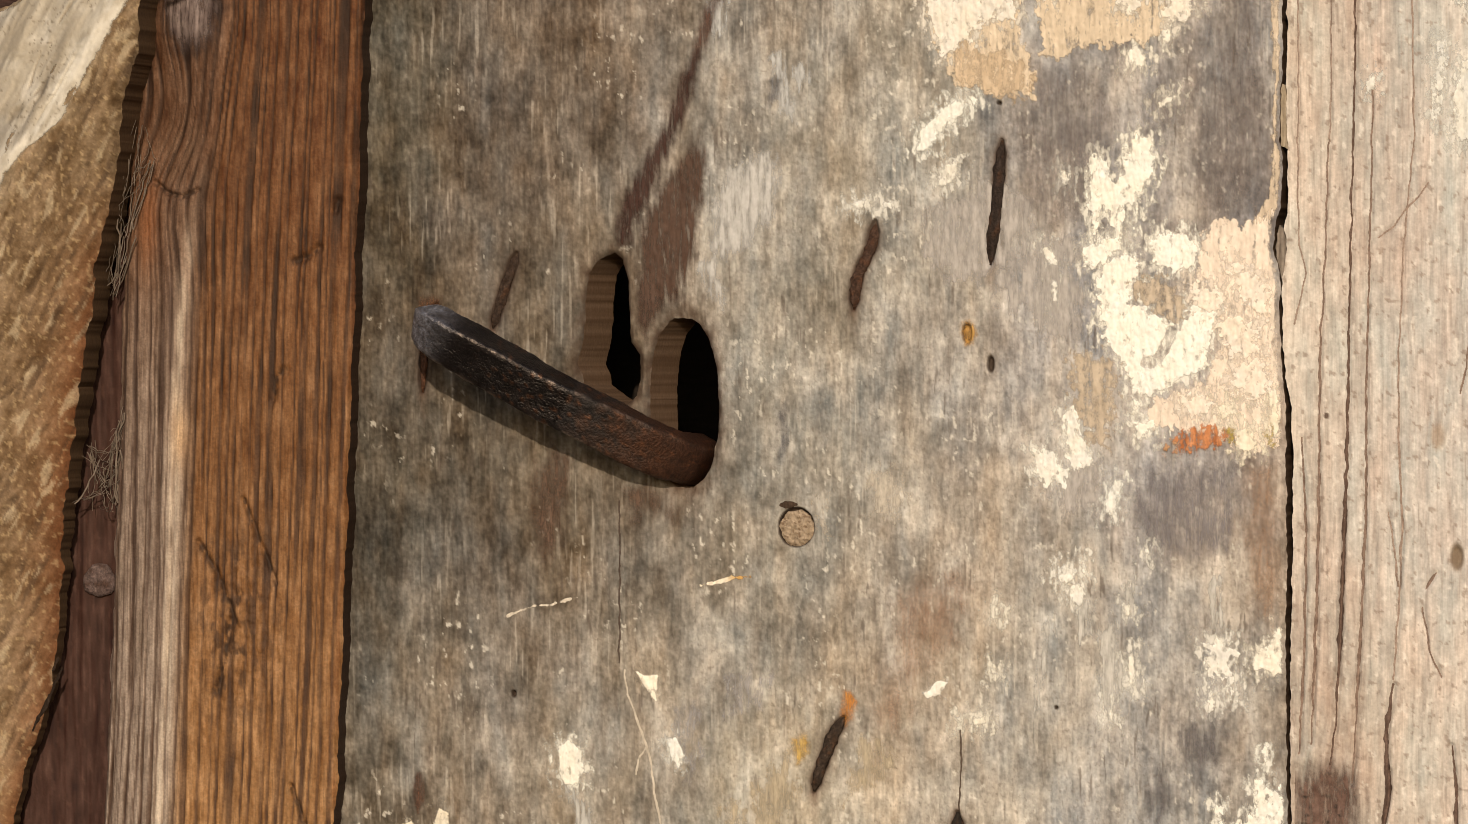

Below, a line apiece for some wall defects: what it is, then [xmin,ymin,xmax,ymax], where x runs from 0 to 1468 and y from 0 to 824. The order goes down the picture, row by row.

rust [617,0,720,332]
peeling [835,188,900,227]
peeling [903,0,1281,467]
rust [1163,424,1235,454]
crack [1294,0,1442,824]
peeling [434,808,449,824]
crack [1451,745,1459,824]